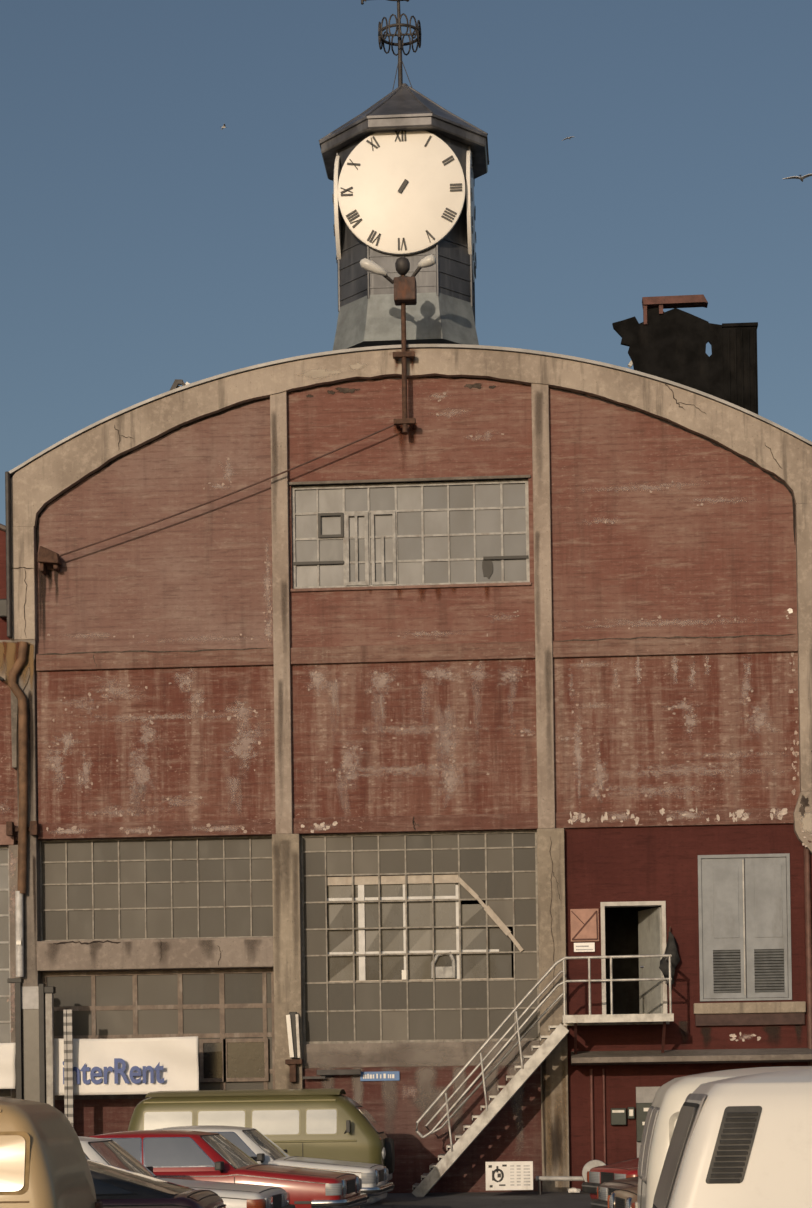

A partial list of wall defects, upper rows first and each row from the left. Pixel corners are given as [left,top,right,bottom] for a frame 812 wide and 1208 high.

crack [12,376,796,666]
rust [0,642,34,684]
peeling [742,668,770,730]
spalling [770,707,812,847]
peeling [568,810,639,825]
peeling [659,797,749,822]